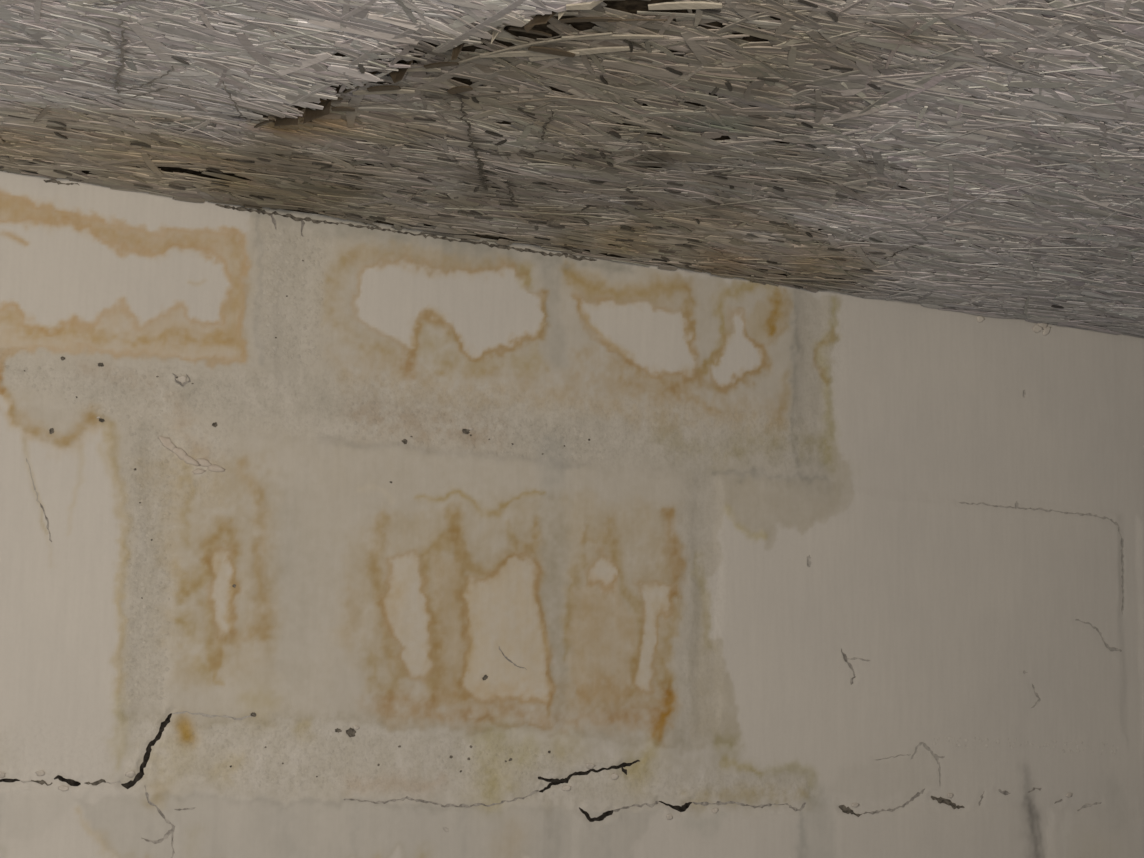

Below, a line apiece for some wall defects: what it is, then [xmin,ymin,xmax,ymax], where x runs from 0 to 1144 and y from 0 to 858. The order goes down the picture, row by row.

damp [0,0,983,298]
damp [0,171,940,858]
crack [0,711,253,858]
crack [344,760,806,822]
crack [839,742,1102,817]